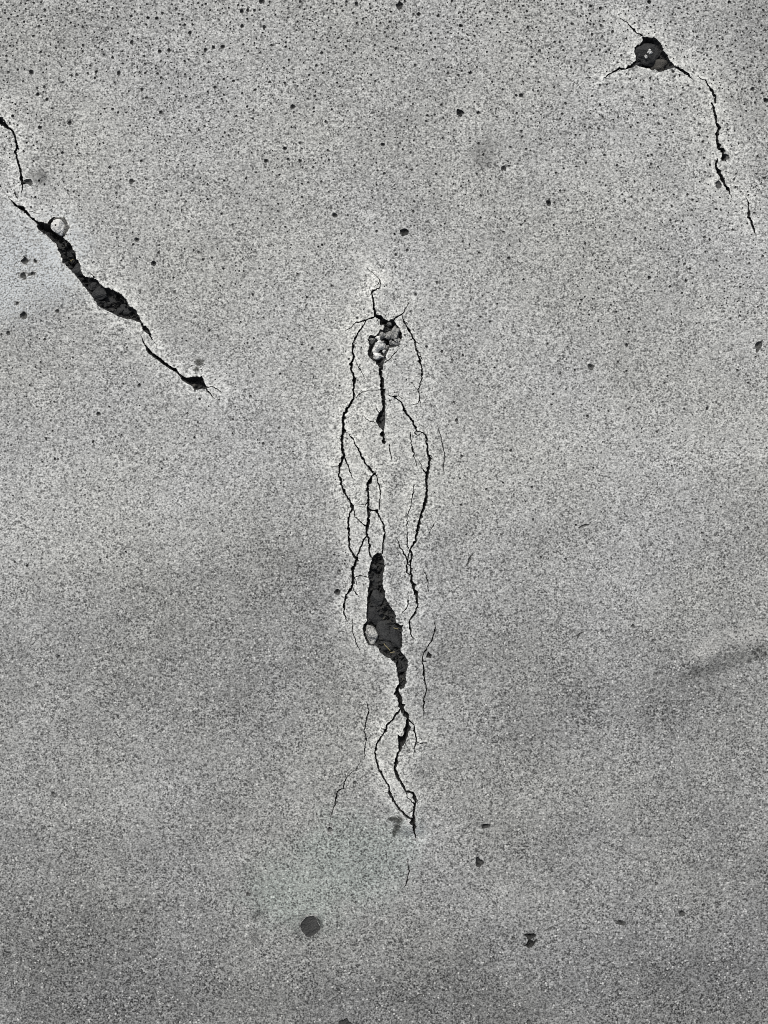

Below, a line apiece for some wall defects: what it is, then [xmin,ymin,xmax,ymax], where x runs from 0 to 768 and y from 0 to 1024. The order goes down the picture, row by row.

crack [0,117,33,193]
crack [698,76,755,234]
crack [140,334,221,399]
spalling [363,552,408,690]
crack [329,267,445,887]